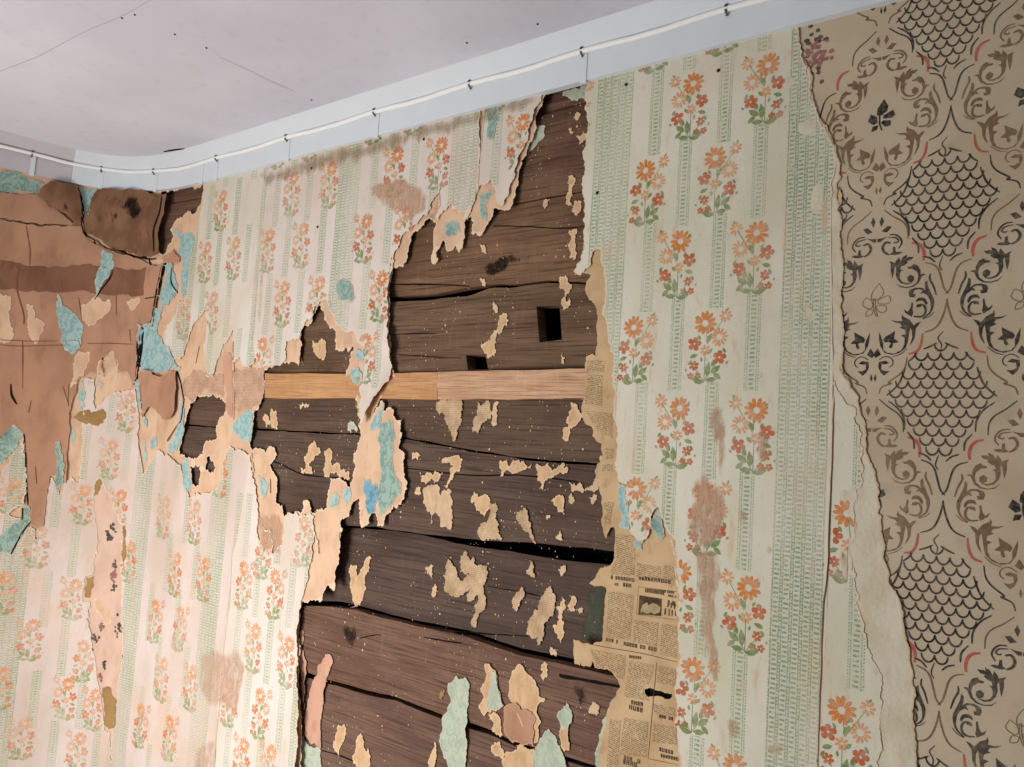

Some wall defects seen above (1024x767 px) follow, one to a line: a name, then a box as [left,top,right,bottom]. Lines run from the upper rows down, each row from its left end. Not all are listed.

crack [393,281,470,289]